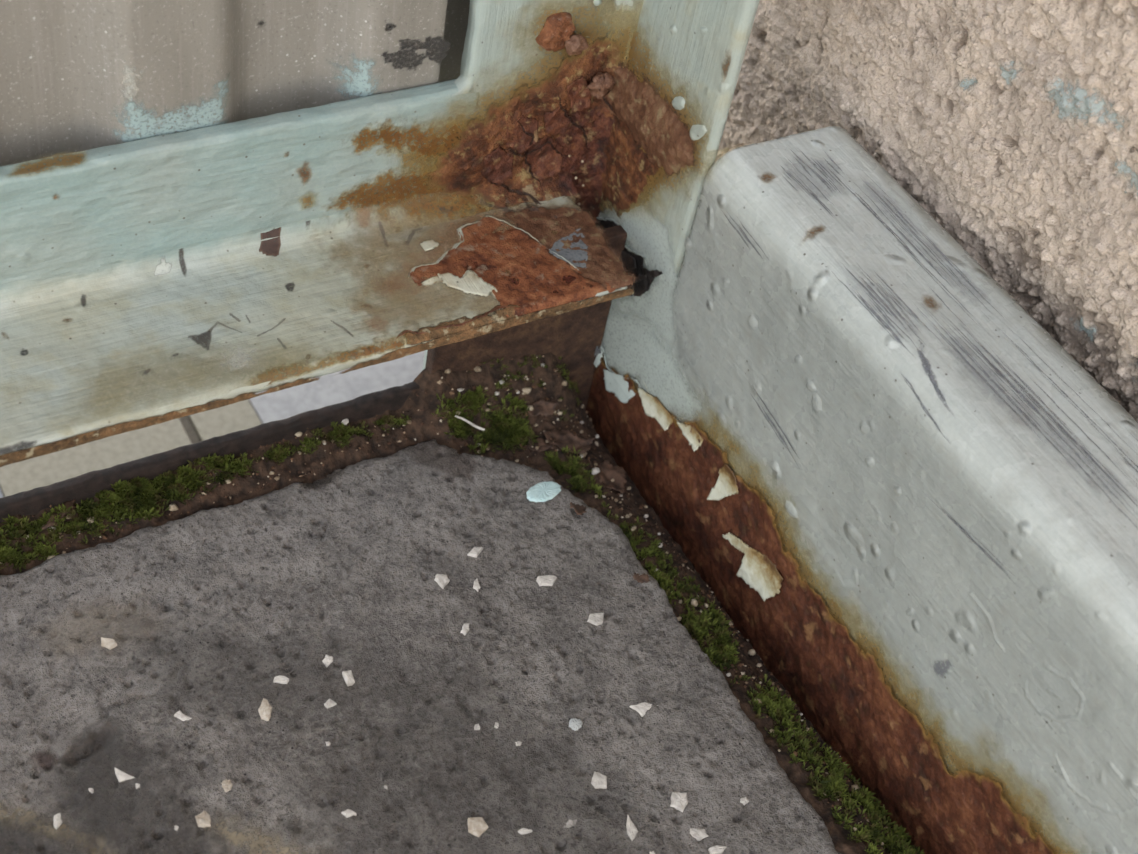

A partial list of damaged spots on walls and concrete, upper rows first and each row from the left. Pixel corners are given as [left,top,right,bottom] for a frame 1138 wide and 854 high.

corrosion [11,153,84,176]
corrosion [329,0,708,227]
peeling [403,205,646,318]
peeling [594,307,703,452]
peeling [707,463,739,501]
peeling [722,532,783,601]
corrosion [586,352,1074,854]